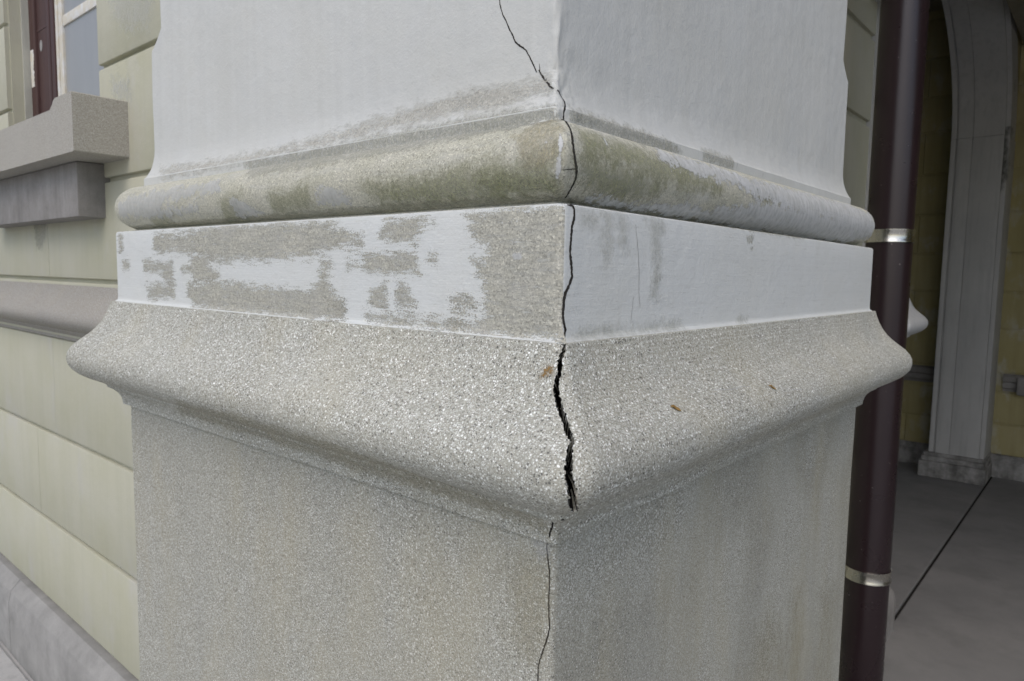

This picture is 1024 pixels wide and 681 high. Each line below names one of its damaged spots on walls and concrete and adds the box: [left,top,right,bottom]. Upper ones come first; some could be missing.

damp [248,105,557,176]
damp [572,113,713,190]
peeling [143,204,567,344]
crack [499,0,579,681]